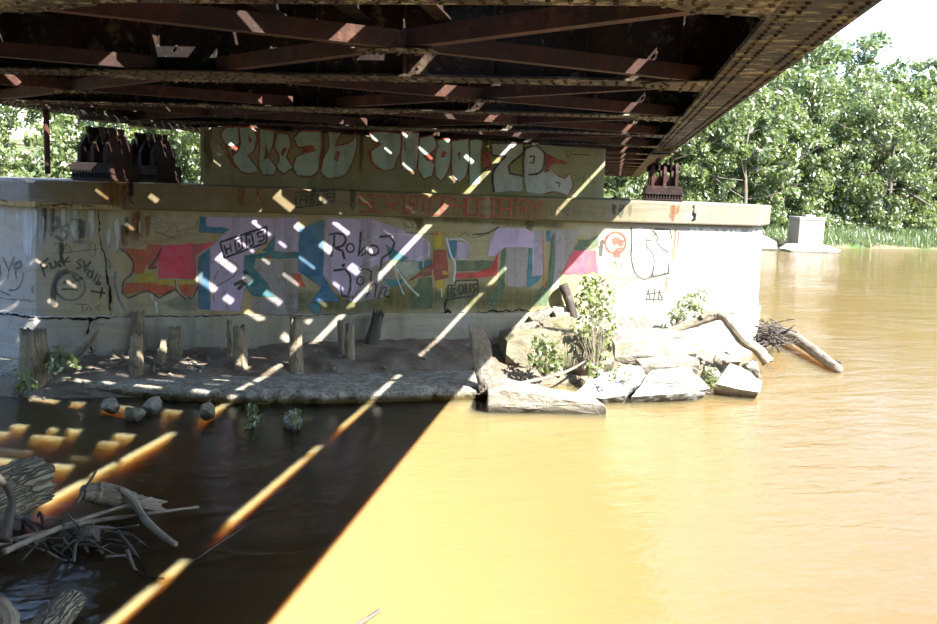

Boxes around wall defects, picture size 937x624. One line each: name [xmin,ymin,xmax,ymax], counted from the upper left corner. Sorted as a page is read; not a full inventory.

crack [0,208,358,351]
damp [689,227,760,280]